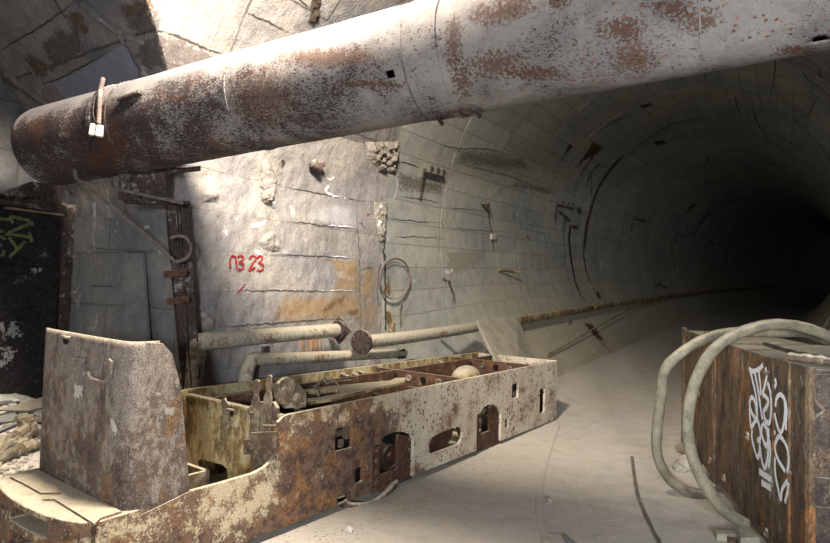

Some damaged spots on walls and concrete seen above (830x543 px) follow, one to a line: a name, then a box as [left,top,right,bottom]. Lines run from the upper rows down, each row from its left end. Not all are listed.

water stain [121,0,154,15]
water stain [42,86,65,102]
rust [279,260,373,320]